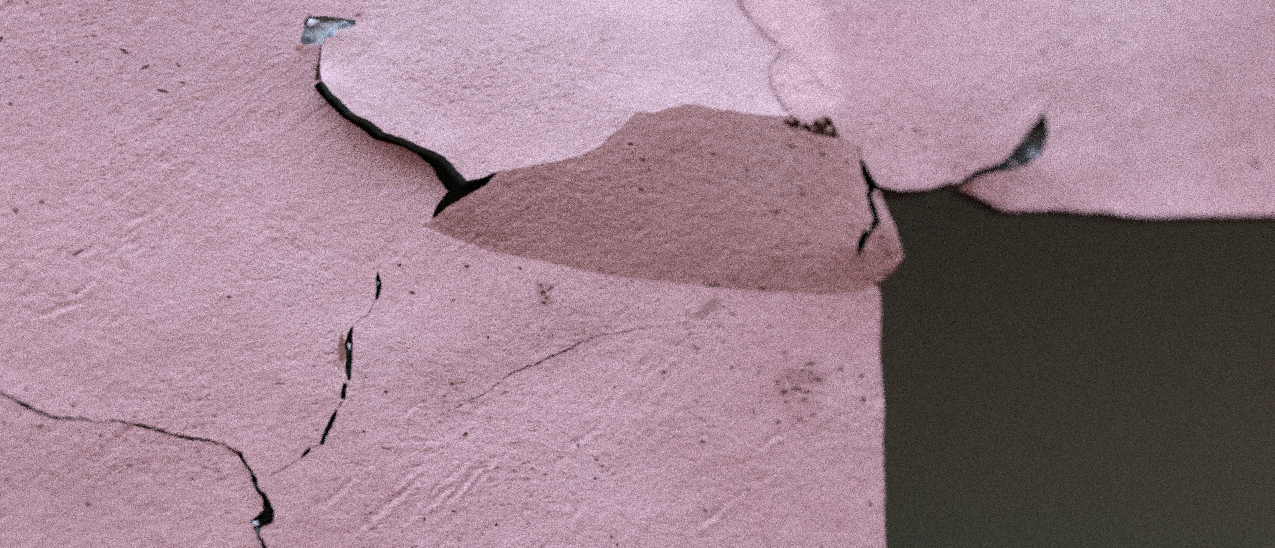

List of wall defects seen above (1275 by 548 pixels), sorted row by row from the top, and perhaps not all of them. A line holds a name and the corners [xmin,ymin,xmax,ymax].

spalling [301,16,356,45]
crack [739,0,833,112]
spalling [783,115,840,138]
spalling [952,111,1049,191]
crack [0,272,382,548]